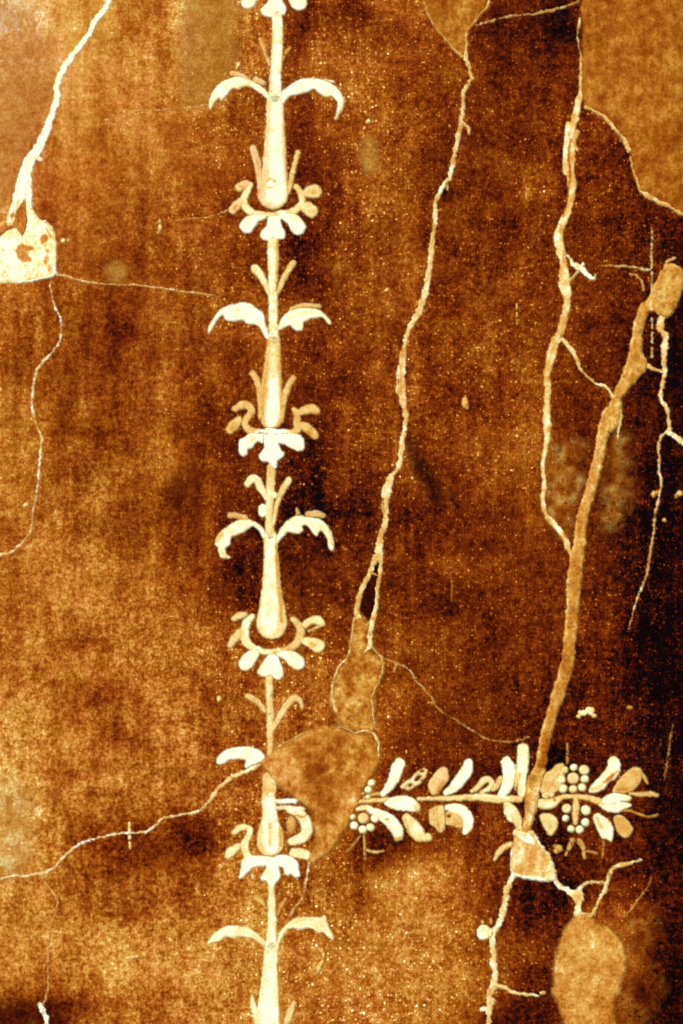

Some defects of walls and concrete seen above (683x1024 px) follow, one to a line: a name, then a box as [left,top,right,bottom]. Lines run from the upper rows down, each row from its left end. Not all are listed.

crack [13,0,112,209]
crack [105,104,209,121]
peeling [0,198,28,234]
crack [170,209,229,221]
crack [0,273,216,556]
crack [354,0,683,832]
crack [1,764,261,1024]
crack [480,873,546,1024]
peeling [552,914,626,1024]
crack [554,859,652,917]